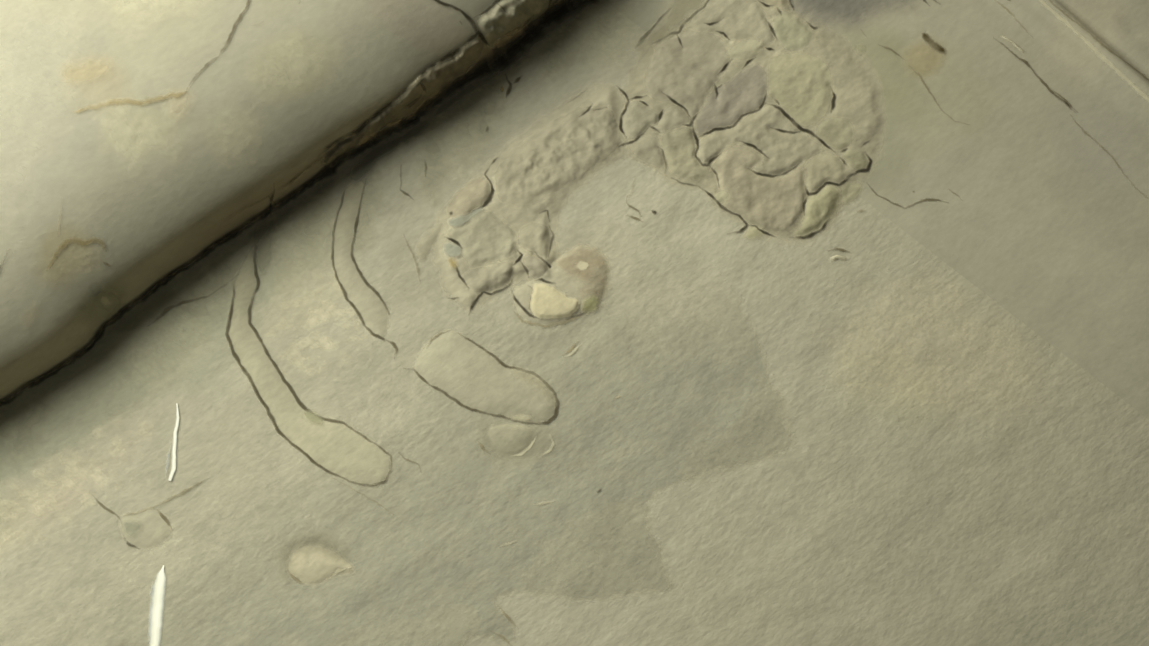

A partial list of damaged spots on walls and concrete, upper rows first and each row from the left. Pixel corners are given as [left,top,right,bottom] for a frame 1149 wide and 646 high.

crack [0,0,599,406]
damp [78,311,790,646]